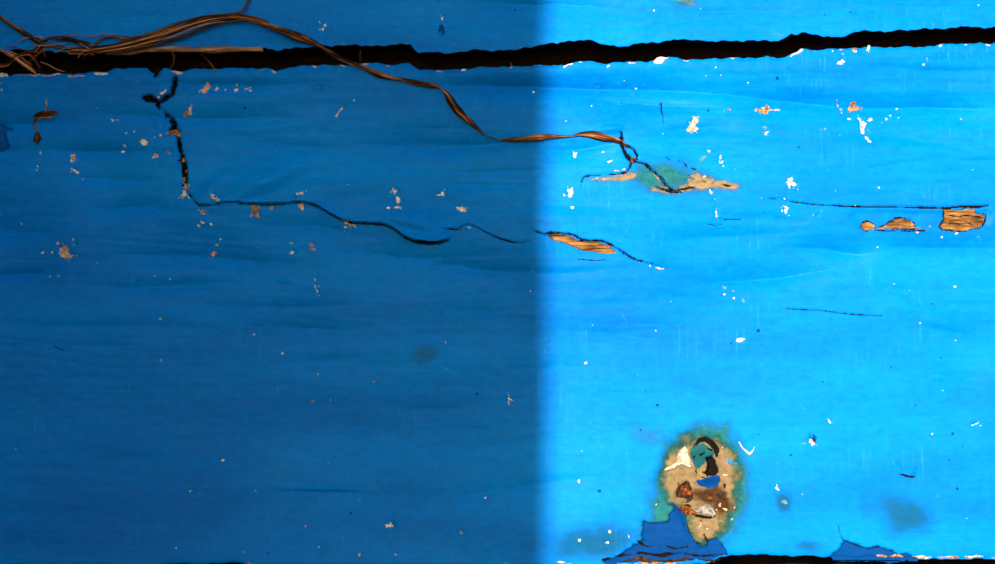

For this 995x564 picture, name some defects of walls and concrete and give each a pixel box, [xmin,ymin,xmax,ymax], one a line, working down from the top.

crack [142,66,193,198]
crack [581,132,731,194]
crack [446,224,524,243]
peeling [532,230,669,270]
peeling [769,176,989,238]
peeling [602,432,755,564]